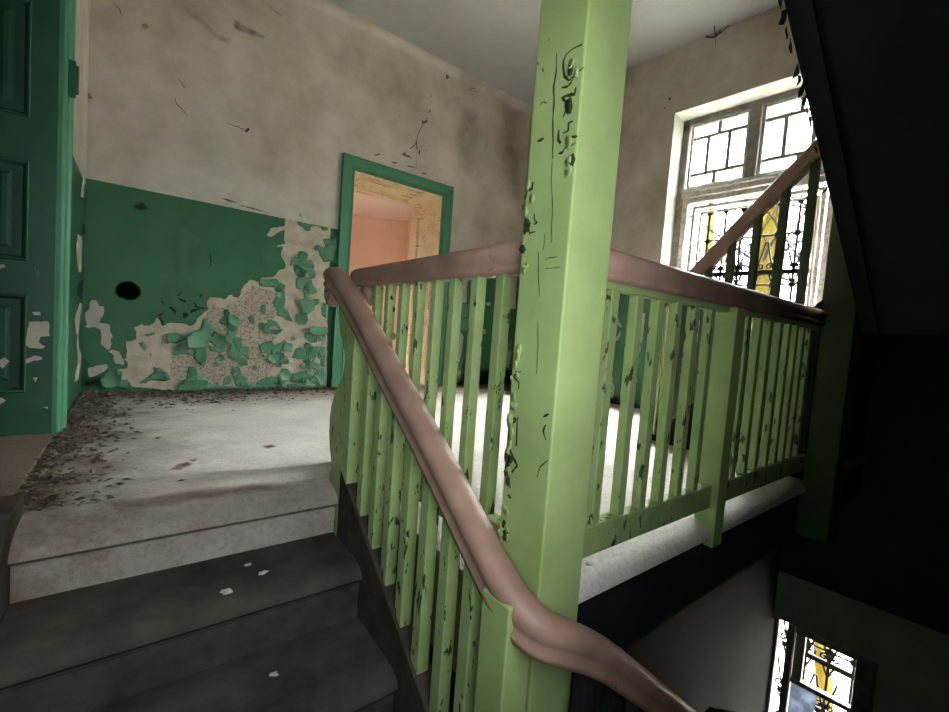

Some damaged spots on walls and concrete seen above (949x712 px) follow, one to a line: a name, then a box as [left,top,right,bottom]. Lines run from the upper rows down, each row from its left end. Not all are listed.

crack [354,96,432,220]
peeling [519,206,531,253]
peeling [26,312,50,364]
peeling [75,214,337,391]